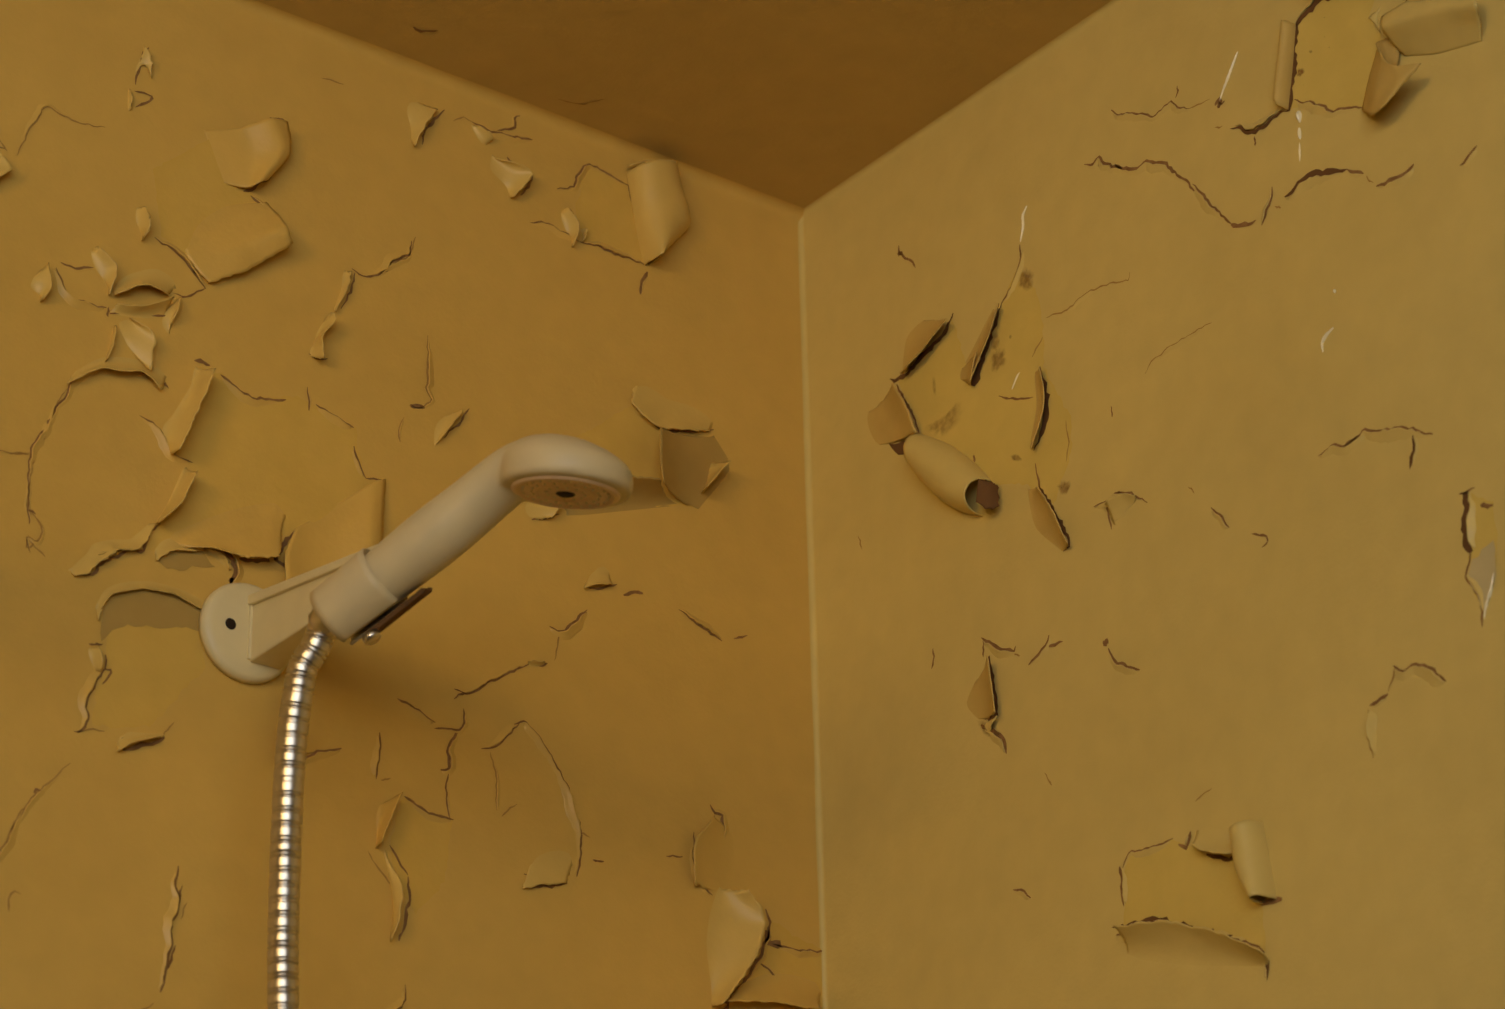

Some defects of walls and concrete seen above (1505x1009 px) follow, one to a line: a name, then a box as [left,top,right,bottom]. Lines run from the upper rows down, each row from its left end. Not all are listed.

crack [1111,87,1209,122]
peeling [1215,0,1482,145]
peeling [530,159,690,294]
crack [1084,156,1414,228]
peeling [10,117,386,752]
peeling [525,386,731,520]
peeling [867,206,1073,551]
crack [1318,426,1433,469]
crack [398,610,604,889]
crack [0,763,70,912]
peeling [707,887,823,1009]
peeling [1112,819,1282,979]